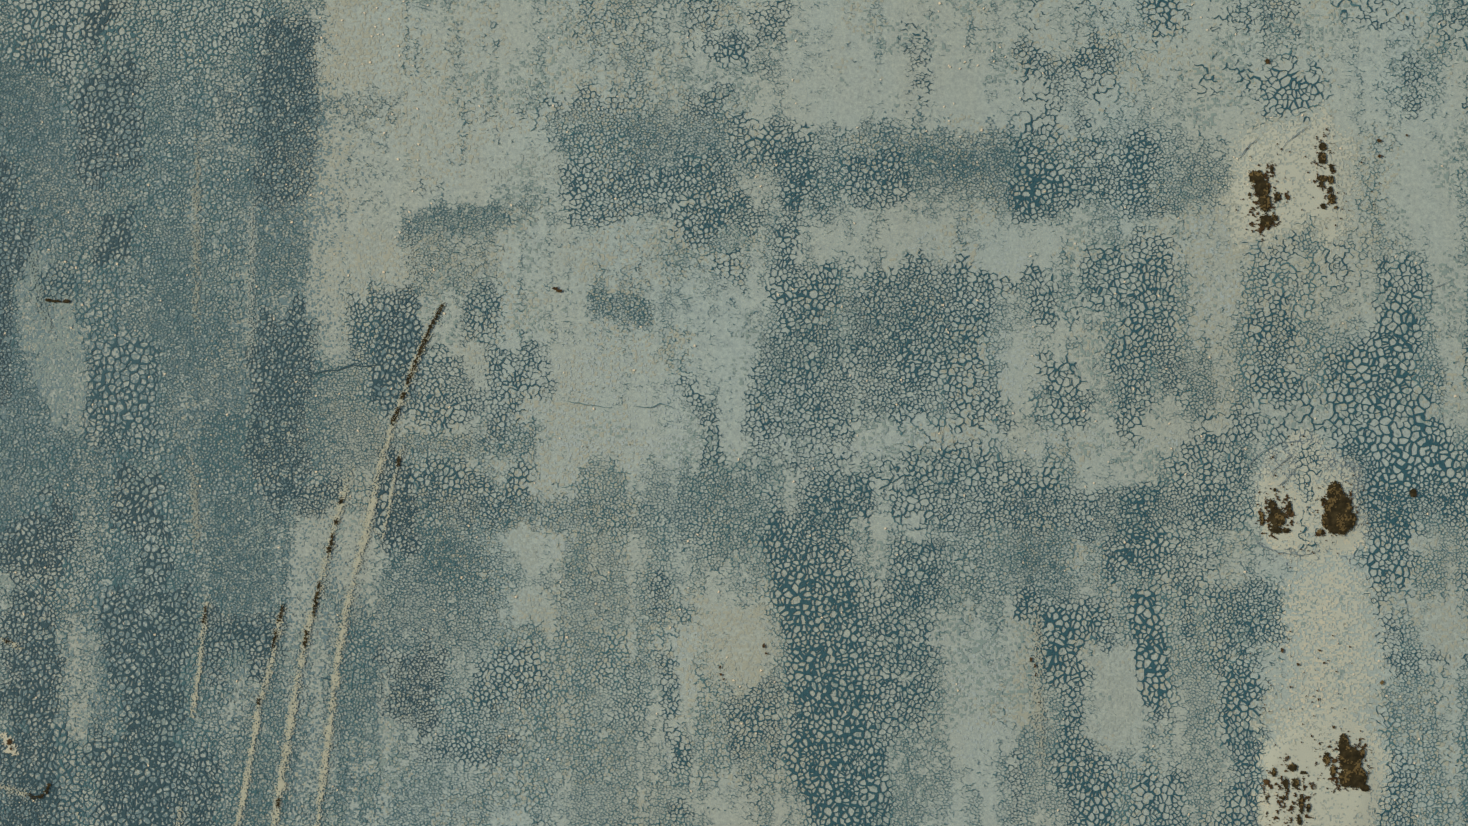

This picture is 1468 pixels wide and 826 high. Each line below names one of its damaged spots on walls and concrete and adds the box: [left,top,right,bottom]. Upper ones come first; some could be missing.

crack [0,0,129,129]
crack [0,50,195,407]
crack [203,1,401,221]
crack [1190,0,1324,147]
rust [1240,162,1290,242]
rust [1310,127,1339,209]
crack [1034,352,1098,433]
rust [1254,480,1360,541]
crack [1246,255,1468,677]
crack [586,543,694,774]
crack [1130,761,1192,826]
rust [1260,725,1373,826]